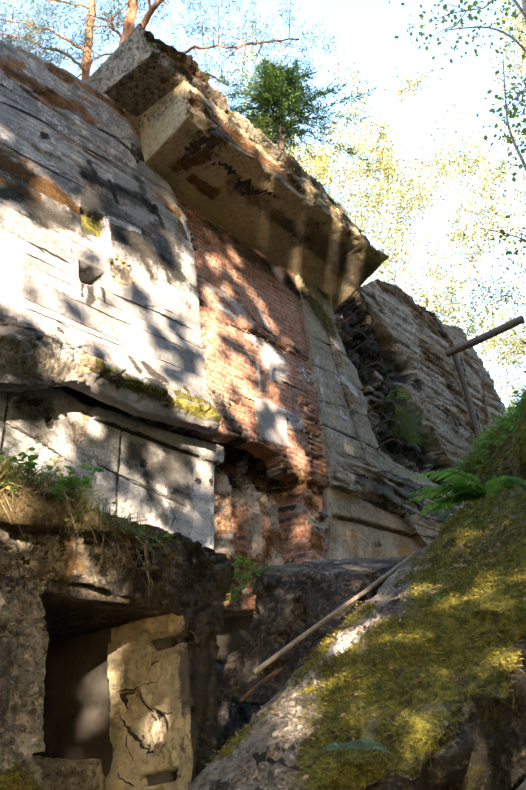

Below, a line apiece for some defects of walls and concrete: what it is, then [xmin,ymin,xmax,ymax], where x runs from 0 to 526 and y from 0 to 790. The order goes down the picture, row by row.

rust [0,62,87,116]
rust [371,279,453,348]
spalling [208,389,236,423]
peeling [286,408,304,431]
rust [418,343,456,396]
rust [463,353,502,424]
peeling [199,449,219,461]
crack [118,682,173,760]